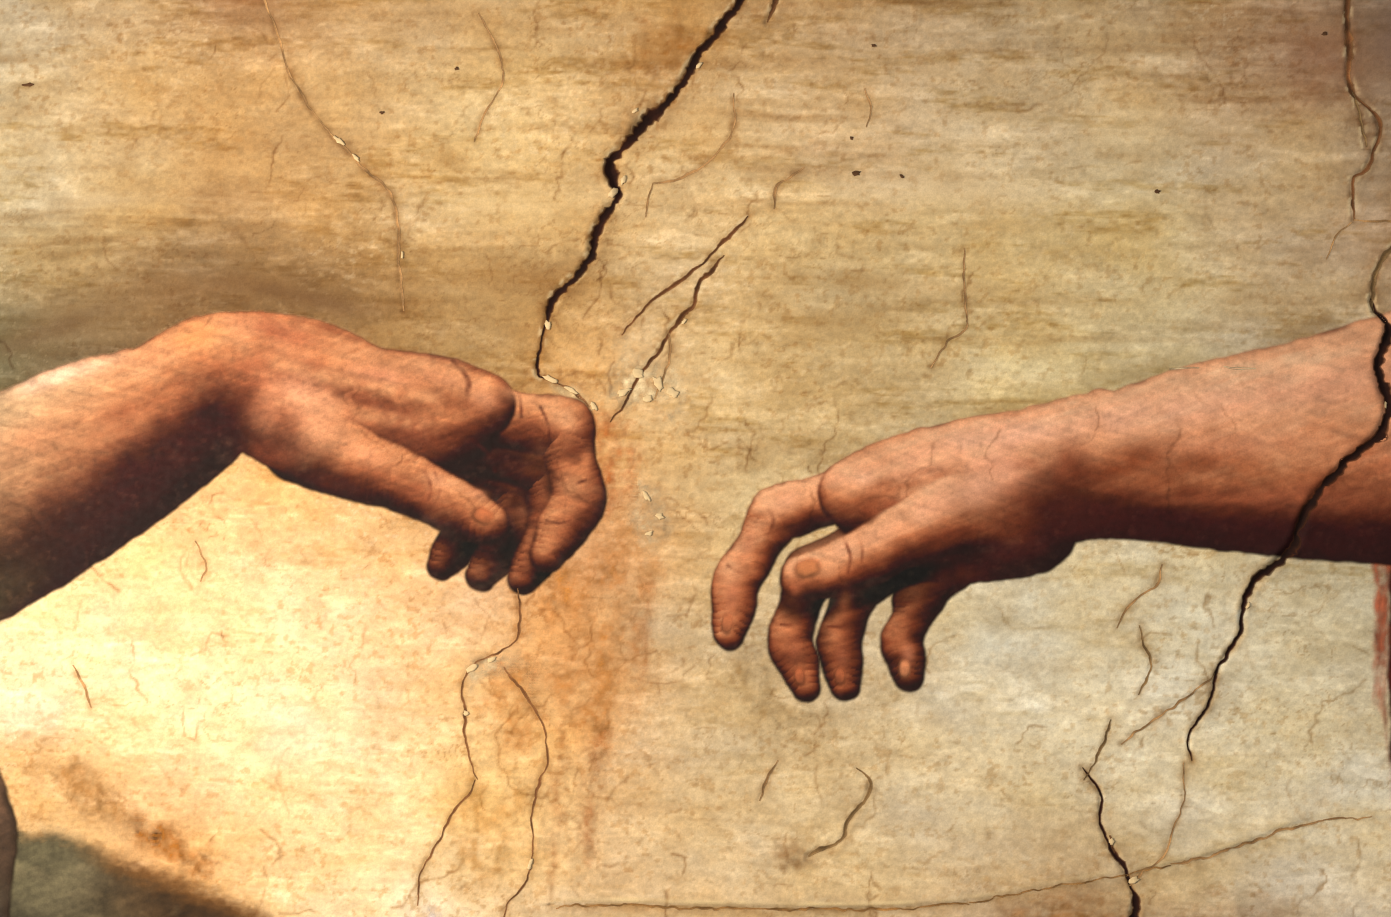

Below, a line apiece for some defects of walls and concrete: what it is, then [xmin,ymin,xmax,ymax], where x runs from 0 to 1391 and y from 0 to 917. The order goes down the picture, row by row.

crack [264,0,404,311]
crack [535,0,805,422]
crack [864,88,872,127]
crack [930,247,968,368]
crack [1082,0,1391,917]
crack [417,588,549,917]
crack [759,760,778,801]
crack [808,768,872,857]